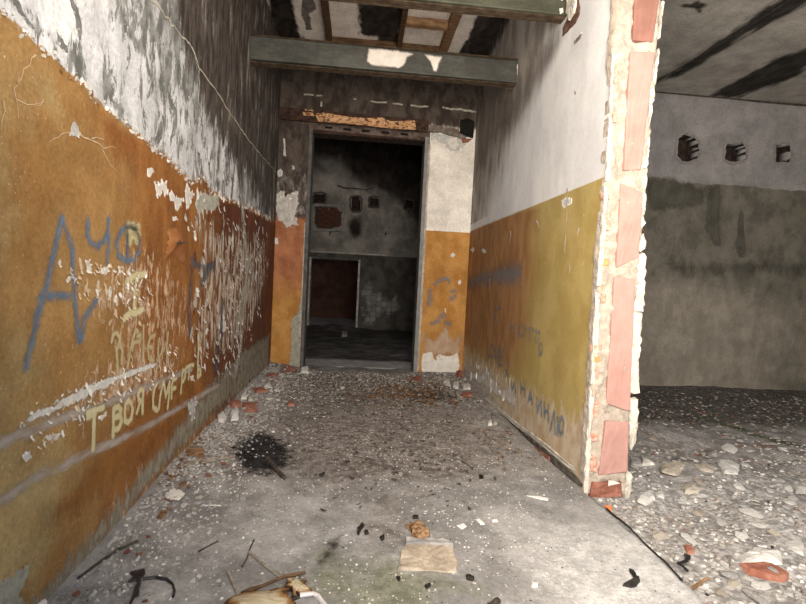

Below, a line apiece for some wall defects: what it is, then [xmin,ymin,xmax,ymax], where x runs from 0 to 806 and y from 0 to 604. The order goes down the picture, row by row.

peeling [301,0,316,30]
spalling [559,0,580,36]
crack [1,54,45,130]
crack [49,132,117,171]
peeling [0,0,300,375]
water stain [647,178,721,245]
spalling [0,565,30,604]